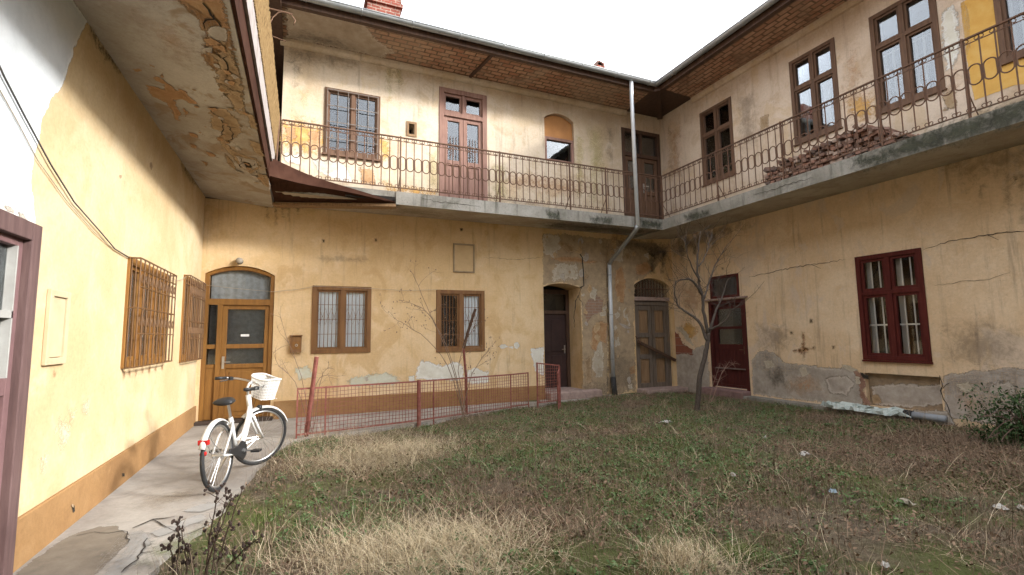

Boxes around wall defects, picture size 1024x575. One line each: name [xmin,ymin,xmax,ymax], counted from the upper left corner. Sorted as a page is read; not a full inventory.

peeling [940,5,962,71]
peeling [134,0,271,188]
damp [855,98,1024,166]
crack [926,231,1024,249]
peeling [542,233,667,395]
peeling [347,361,489,388]
peeling [500,342,545,376]
spalling [675,323,711,393]
spalling [752,350,1024,426]